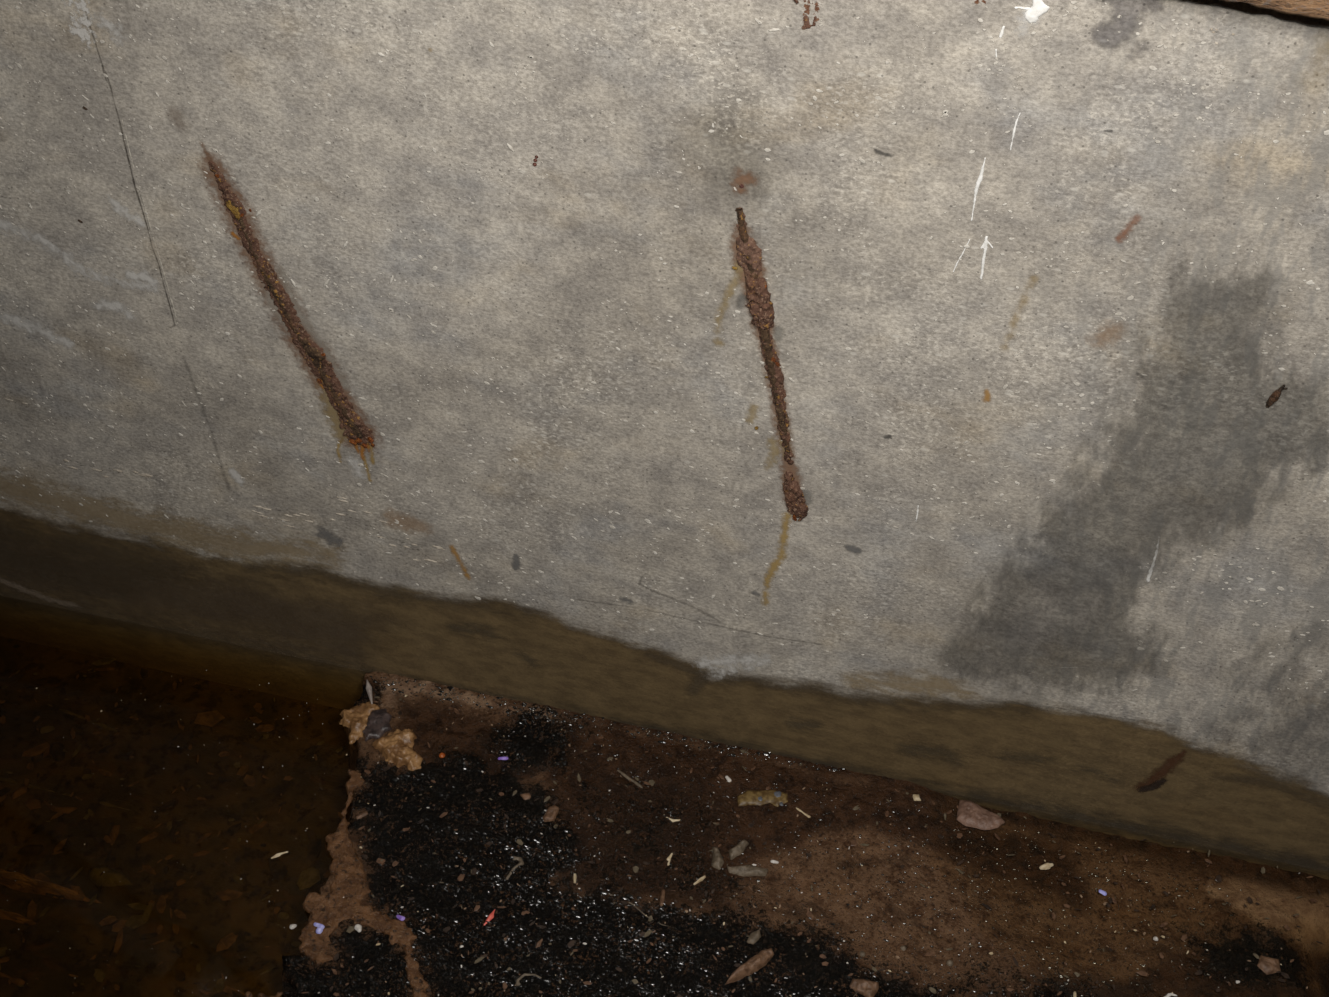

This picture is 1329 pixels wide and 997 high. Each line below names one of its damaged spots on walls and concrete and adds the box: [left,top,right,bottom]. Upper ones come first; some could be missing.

water stain [0,220,158,319]
crack [86,15,178,325]
corrosion [794,0,820,30]
water stain [0,273,1329,880]